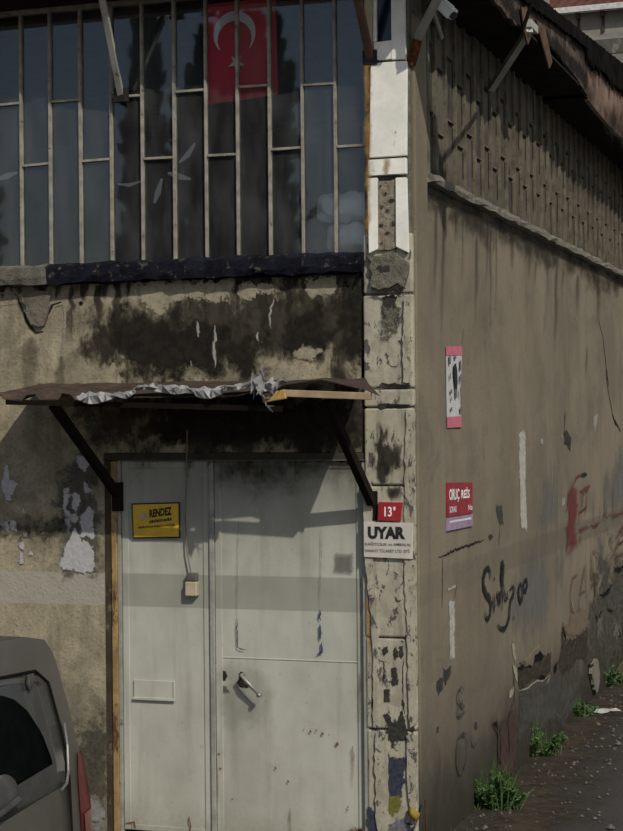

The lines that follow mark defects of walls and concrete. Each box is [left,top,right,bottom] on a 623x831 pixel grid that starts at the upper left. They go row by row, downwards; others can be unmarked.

spalling [51,455,103,577]
leakage [34,272,366,461]
leakage [72,384,349,481]
leakage [376,426,401,498]
crack [599,323,621,431]
spalling [509,553,623,748]
peeling [378,646,415,831]
peeling [366,807,377,831]